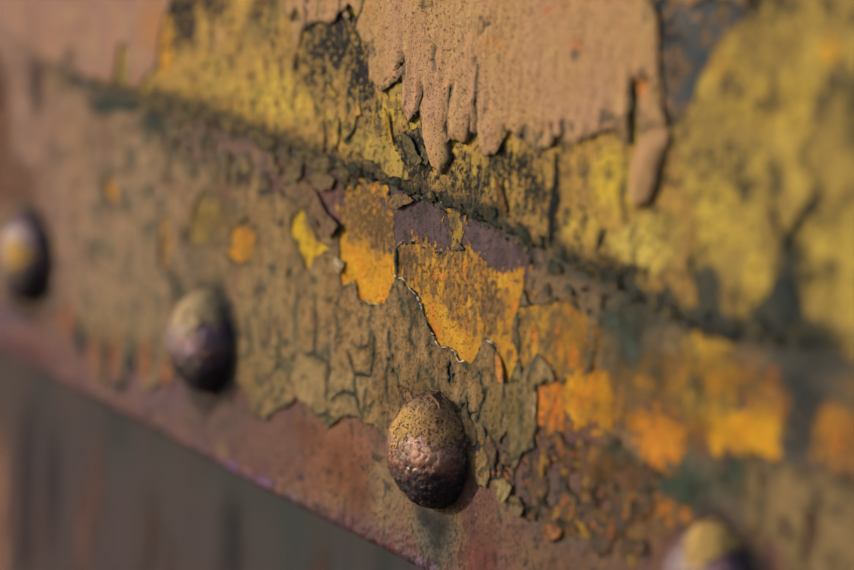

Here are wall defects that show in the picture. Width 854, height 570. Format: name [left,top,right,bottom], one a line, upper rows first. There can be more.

peeling [147,0,854,356]
crack [547,136,559,244]
crack [595,227,606,251]
crack [307,295,390,419]
crack [468,391,506,420]
peeling [283,161,783,560]
peeling [787,394,854,479]